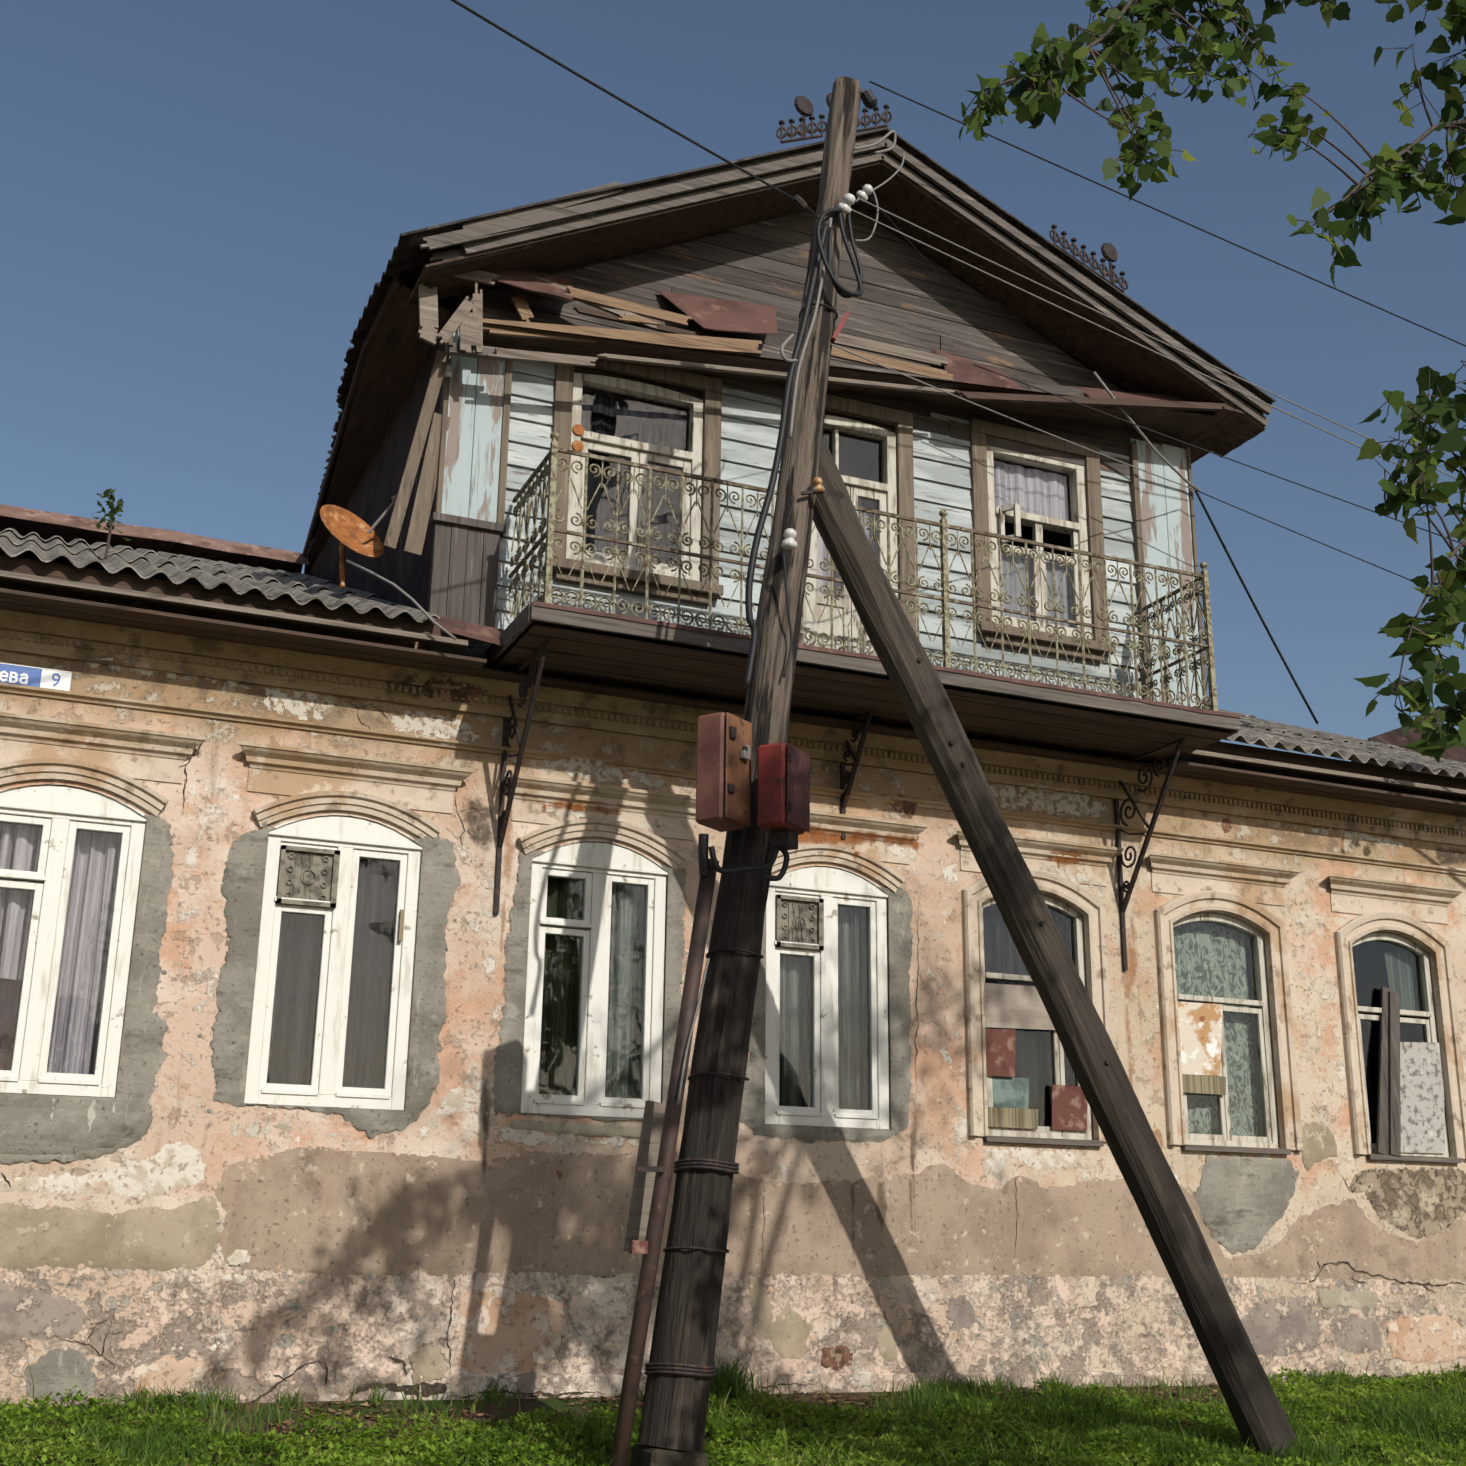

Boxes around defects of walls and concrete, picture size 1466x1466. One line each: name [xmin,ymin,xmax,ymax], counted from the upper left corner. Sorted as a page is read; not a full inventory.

peeling [391,677,488,746]
crack [179,740,205,809]
peeling [990,782,1110,818]
spalling [1222,818,1232,833]
spalling [1349,1166,1466,1239]
crack [1296,1260,1464,1291]
spalling [0,1268,96,1402]
spalling [748,1277,906,1380]
spalling [946,1295,978,1341]
peeling [132,1338,224,1404]